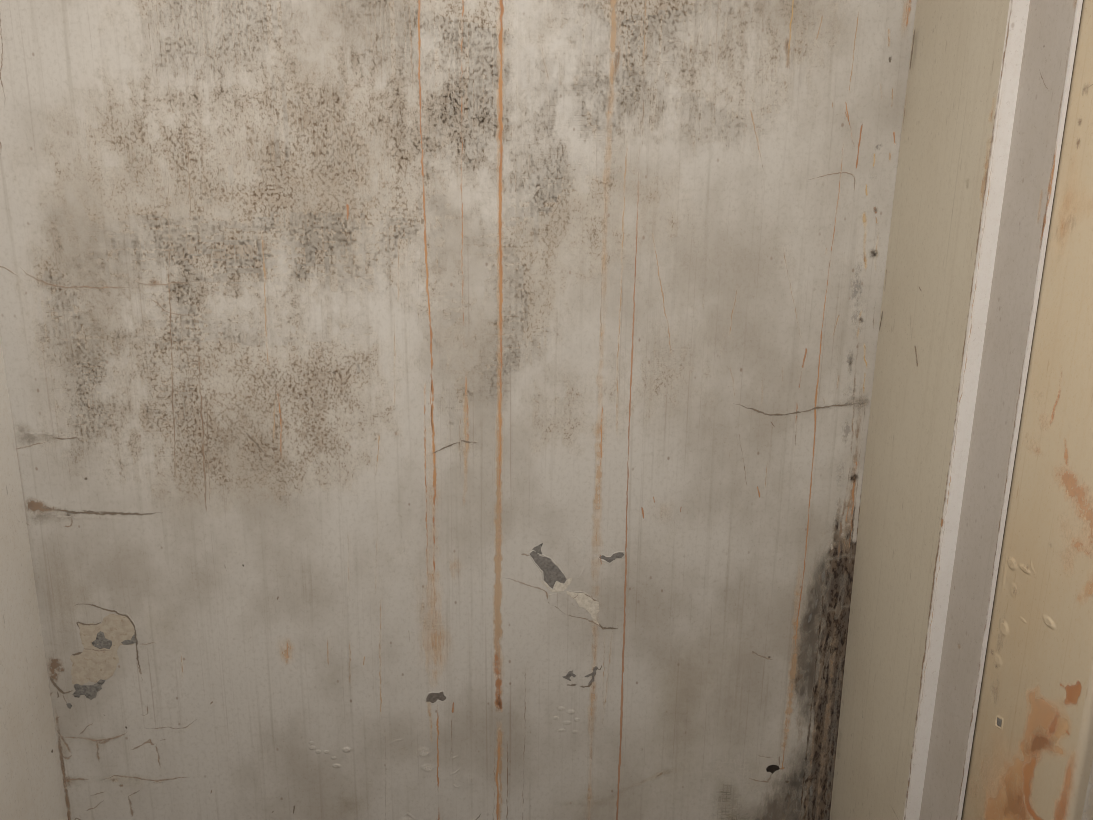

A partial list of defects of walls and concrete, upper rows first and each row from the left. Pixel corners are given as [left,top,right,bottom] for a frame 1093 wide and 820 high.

mould [573,0,752,146]
mould [36,0,523,499]
rust [411,0,436,570]
rust [494,0,504,709]
mould [480,126,621,397]
crack [736,399,867,416]
crack [28,501,153,527]
spalling [49,604,142,709]
spalling [425,691,448,704]
spalling [514,536,625,629]
water stain [758,456,858,820]
rust [1060,681,1081,704]